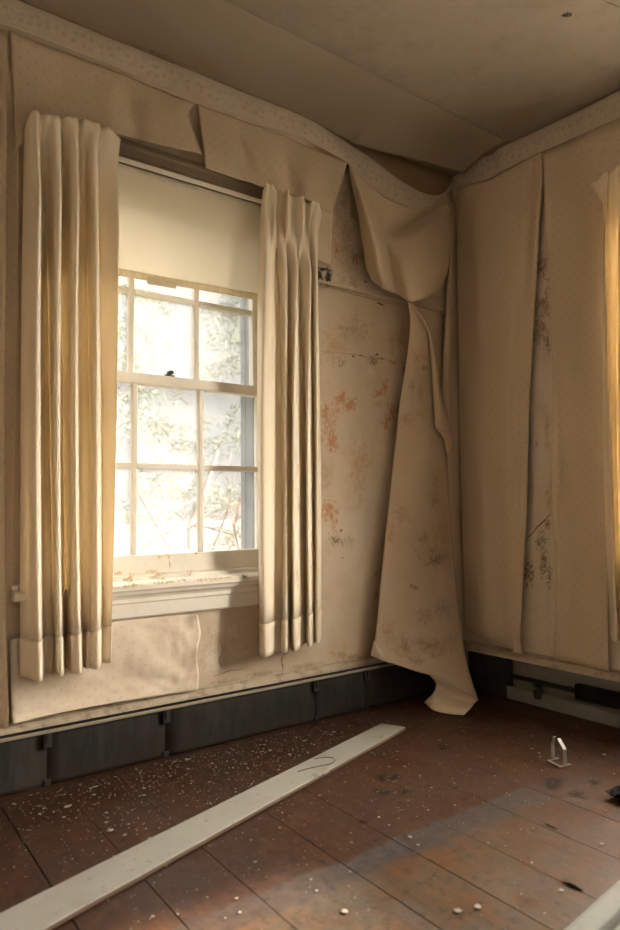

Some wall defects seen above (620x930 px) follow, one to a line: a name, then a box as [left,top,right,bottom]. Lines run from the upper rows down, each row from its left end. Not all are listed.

flaking render [335,134,453,202]
water stain [319,310,407,380]
flaking render [529,249,552,496]
peeling [380,394,399,443]
water stain [523,479,553,593]